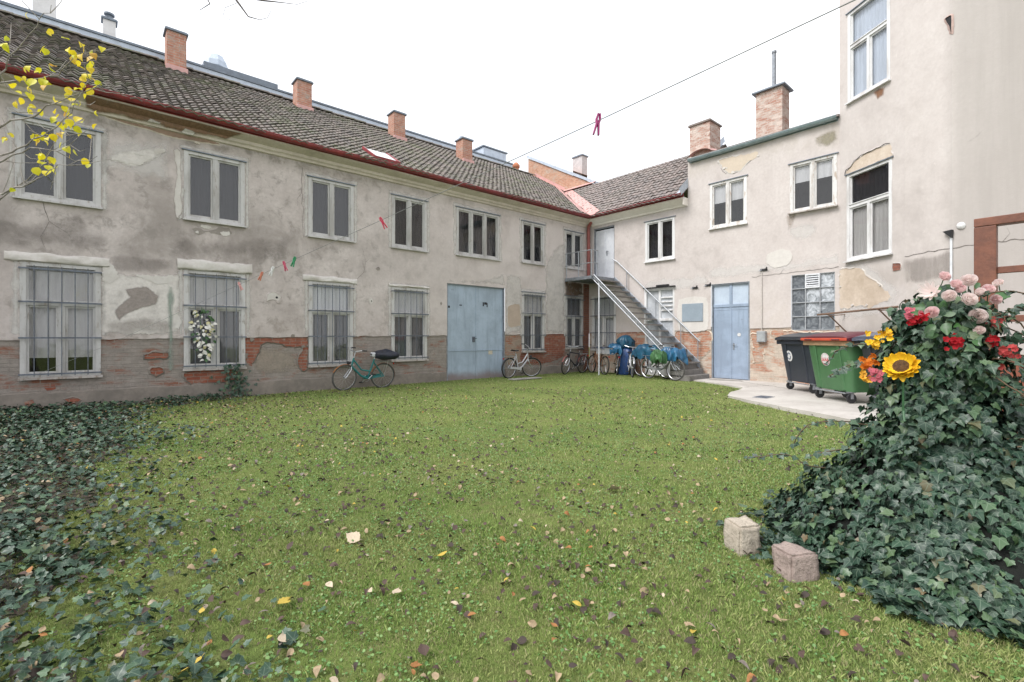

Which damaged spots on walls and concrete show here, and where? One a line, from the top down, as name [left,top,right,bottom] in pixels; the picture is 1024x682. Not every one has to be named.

peeling [717,151,759,174]
spalling [844,143,894,175]
spalling [116,274,175,319]
spalling [838,267,892,311]
flaking render [143,350,171,378]
flaking render [181,334,309,385]
flaking render [750,330,836,363]